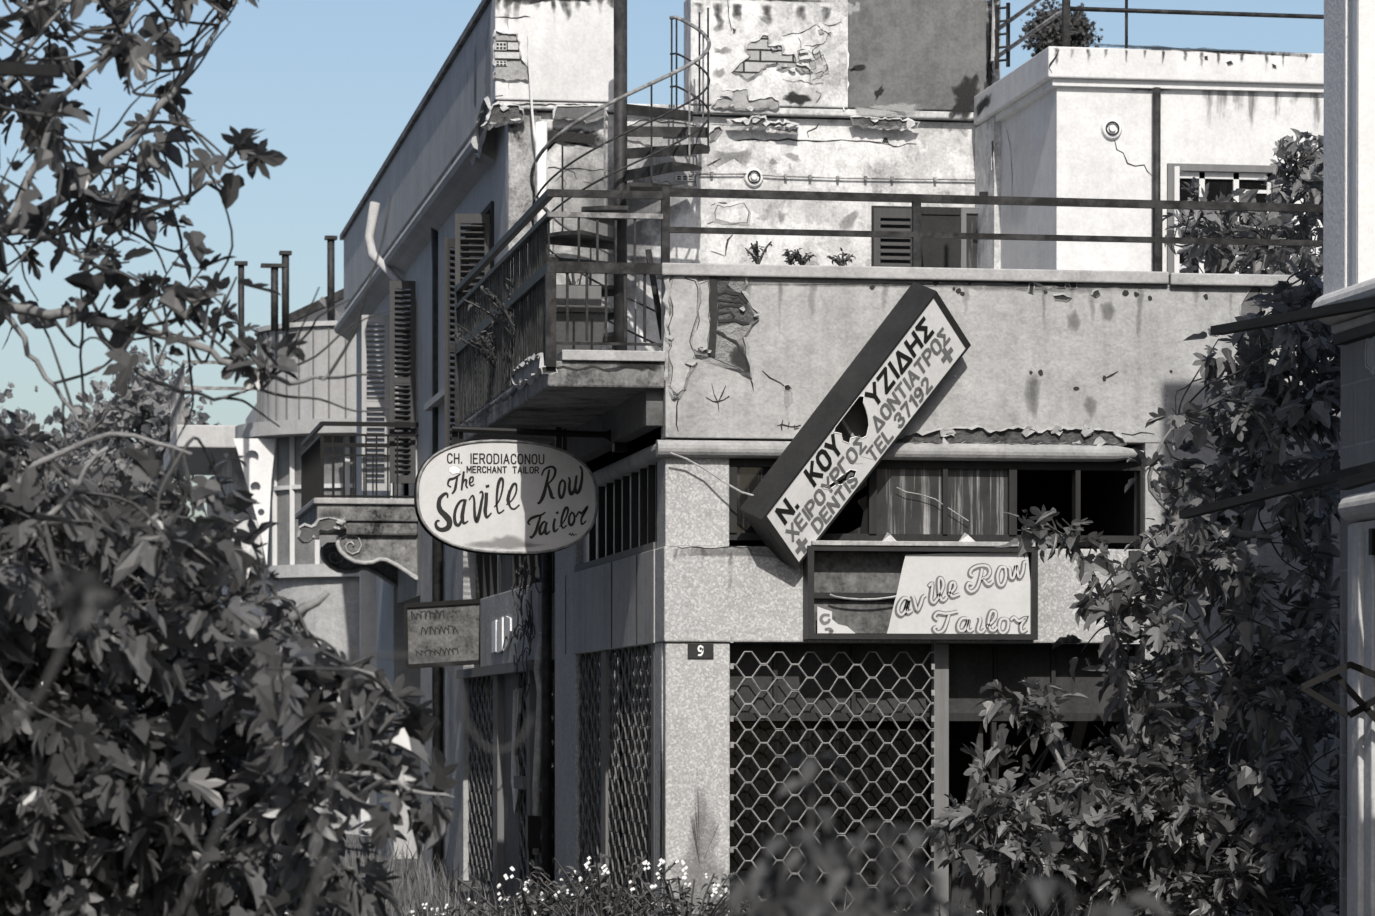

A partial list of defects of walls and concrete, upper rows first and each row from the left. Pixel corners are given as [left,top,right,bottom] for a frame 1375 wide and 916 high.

damp [496,0,614,16]
flaking render [492,29,529,83]
flaking render [469,96,525,166]
flaking render [553,104,609,123]
flaking render [627,32,829,188]
crack [1114,140,1151,175]
flaking render [662,276,759,400]
flaking render [897,424,1127,447]